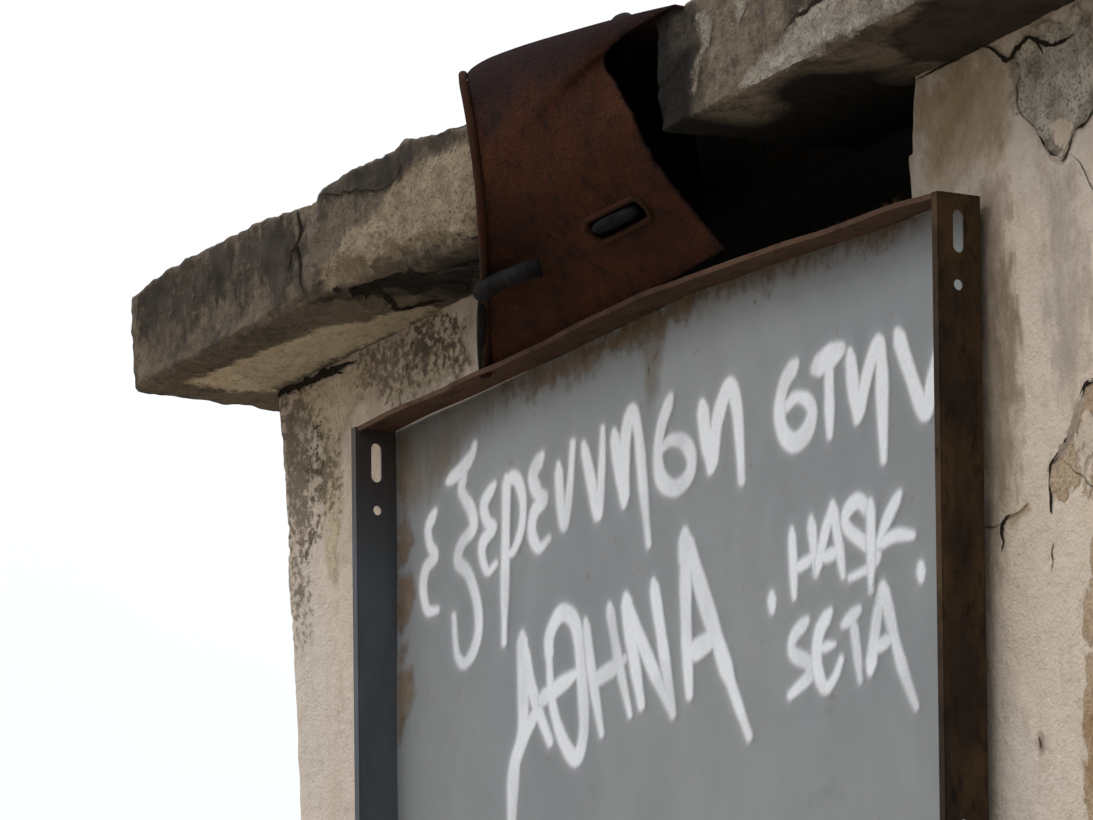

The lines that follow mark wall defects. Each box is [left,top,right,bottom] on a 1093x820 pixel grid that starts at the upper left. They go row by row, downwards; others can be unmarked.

spalling [1009,2,1093,166]
crack [288,210,480,311]
peeling [1047,378,1093,506]
peeling [1082,538,1093,820]